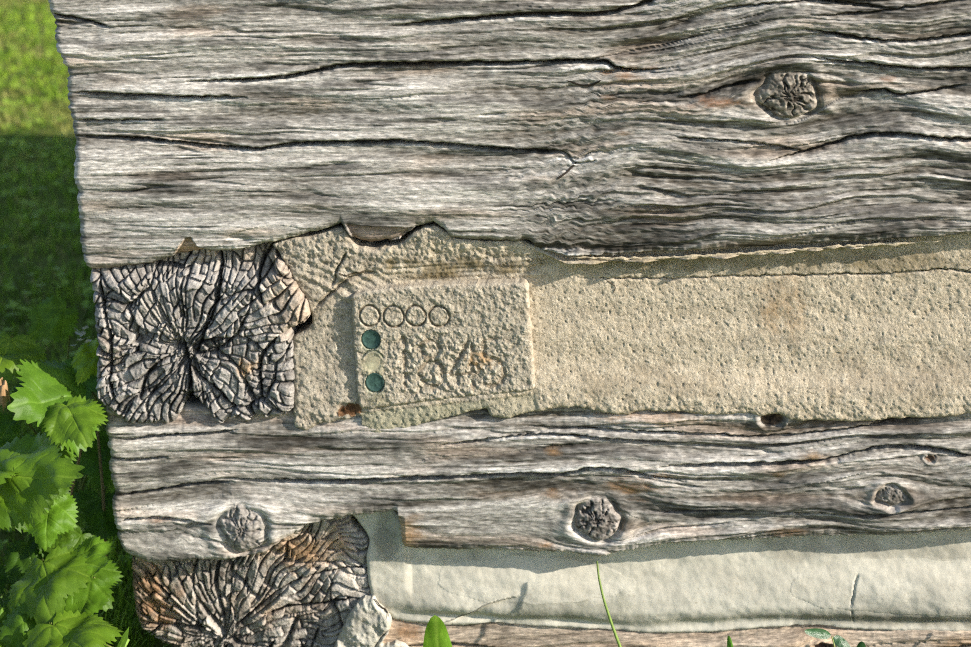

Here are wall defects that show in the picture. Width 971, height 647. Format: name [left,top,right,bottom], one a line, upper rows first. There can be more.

crack [577,276,667,293]